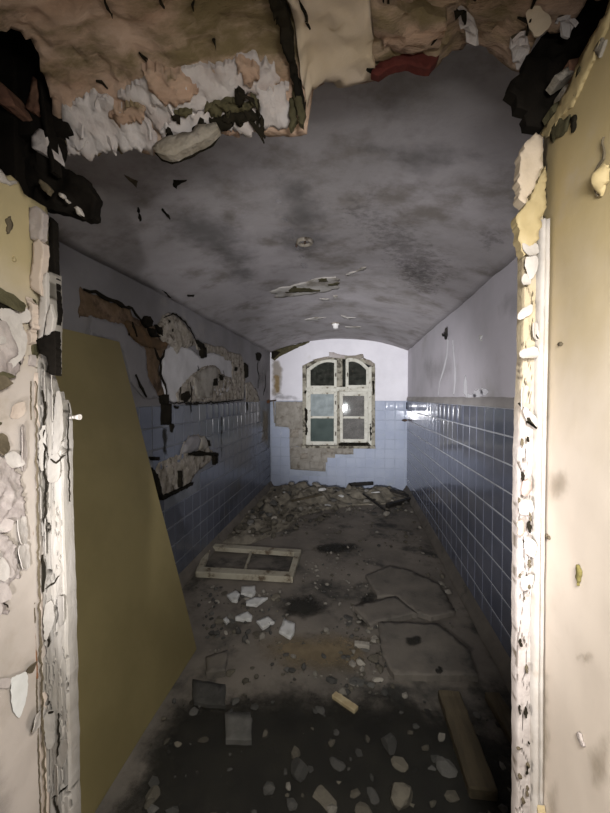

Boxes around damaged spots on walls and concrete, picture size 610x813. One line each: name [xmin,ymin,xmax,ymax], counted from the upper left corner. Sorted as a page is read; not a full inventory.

flaking render [366,39,439,82]
spalling [503,0,610,143]
peeling [0,50,290,225]
peeling [521,243,539,285]
peeling [0,288,31,390]
spalling [78,287,249,405]
peeling [517,304,539,358]
peeling [0,402,30,616]
spalling [149,434,219,500]
peeling [275,401,353,471]
peeling [517,497,538,600]
peeling [0,661,37,718]